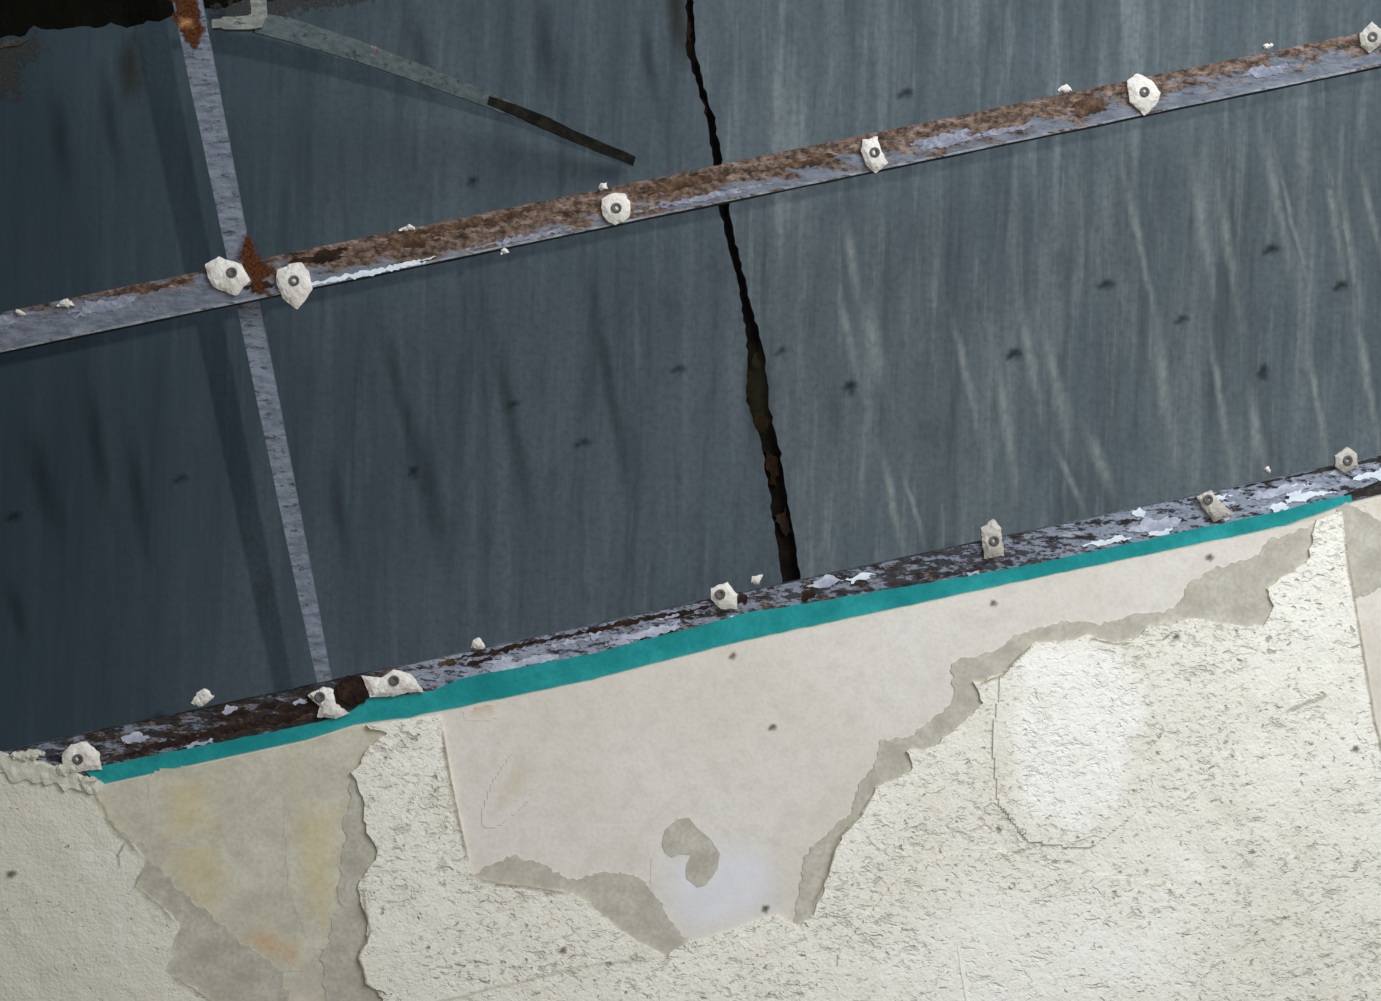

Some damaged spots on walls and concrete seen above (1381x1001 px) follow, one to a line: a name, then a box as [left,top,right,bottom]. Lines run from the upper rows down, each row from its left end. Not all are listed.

rust [170,0,206,49]
rust [237,233,276,297]
rust [746,369,771,433]
rust [764,451,779,487]
rust [1234,466,1337,489]
rust [1344,480,1381,499]
peeling [121,698,340,754]
peeling [437,468,1381,956]
peeling [0,725,387,1001]